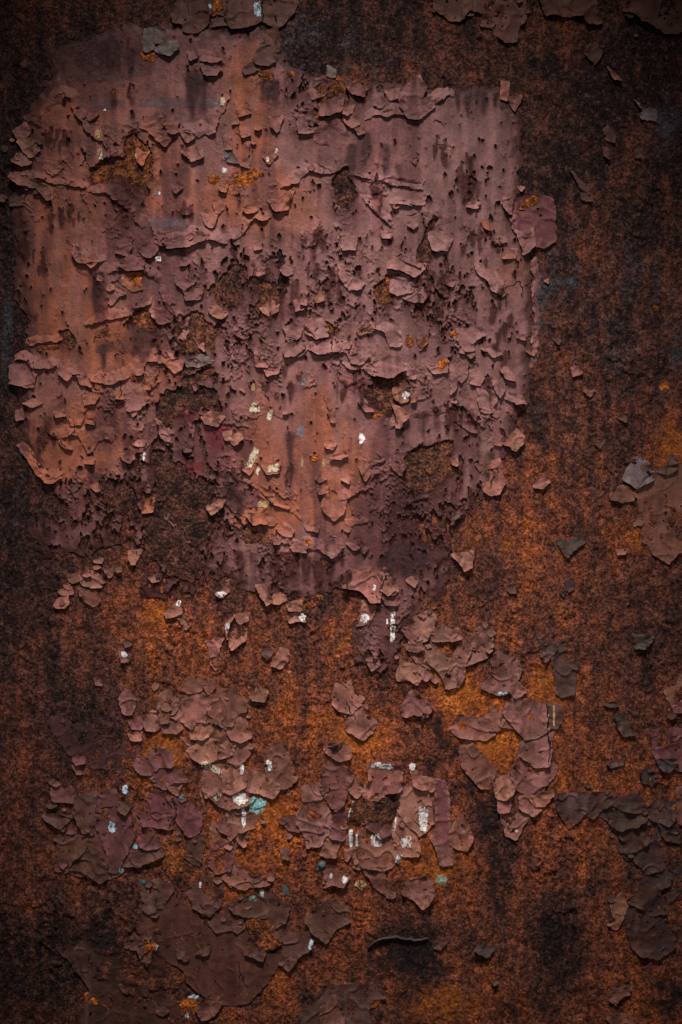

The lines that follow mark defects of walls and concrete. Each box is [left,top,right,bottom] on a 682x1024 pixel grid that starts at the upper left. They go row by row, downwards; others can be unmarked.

corrosion [90,133,153,189]
corrosion [221,227,341,324]
corrosion [129,310,223,425]
peeling [0,0,557,690]
corrosion [341,375,410,418]
corrosion [403,402,472,492]
corrosion [91,433,352,612]
peeling [609,455,682,564]
peeling [536,632,579,698]
peeling [42,613,474,1024]
corrosion [349,793,400,826]
peeling [449,650,682,961]